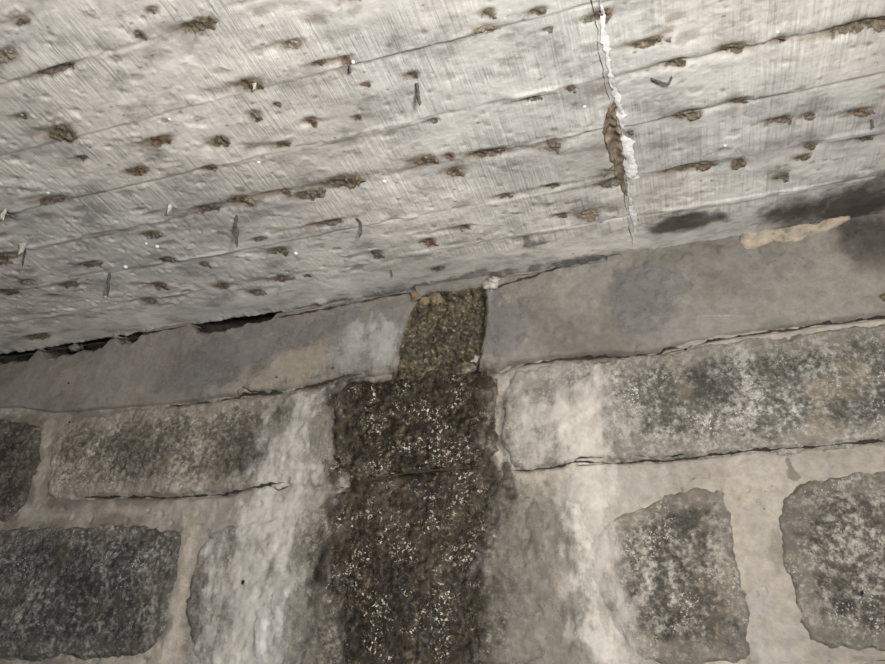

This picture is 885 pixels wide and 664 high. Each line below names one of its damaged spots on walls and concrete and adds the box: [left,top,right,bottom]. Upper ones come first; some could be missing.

damp [766,174,885,264]
damp [411,269,517,290]
damp [528,254,618,272]
crack [0,326,182,359]
damp [155,290,639,664]